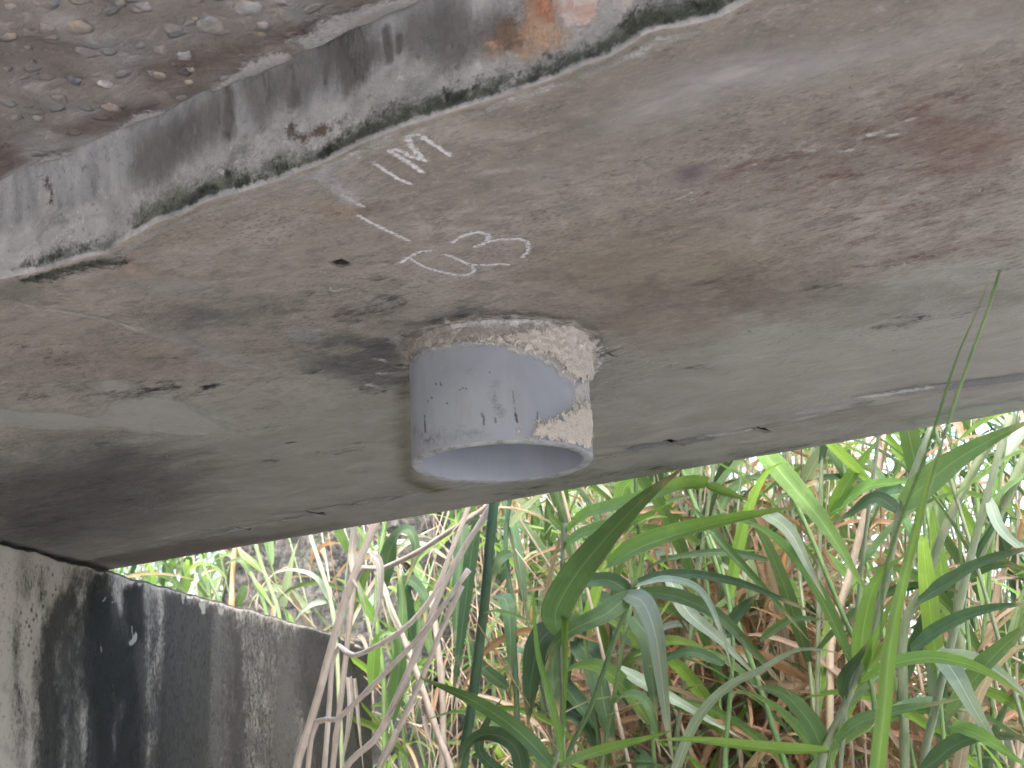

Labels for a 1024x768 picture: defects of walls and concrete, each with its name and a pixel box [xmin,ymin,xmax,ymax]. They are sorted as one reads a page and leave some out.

leakage [247,3,500,116]
rust [484,0,599,59]
leakage [135,85,234,180]
leakage [287,115,354,142]
leakage [23,568,243,768]
leakage [283,625,373,768]